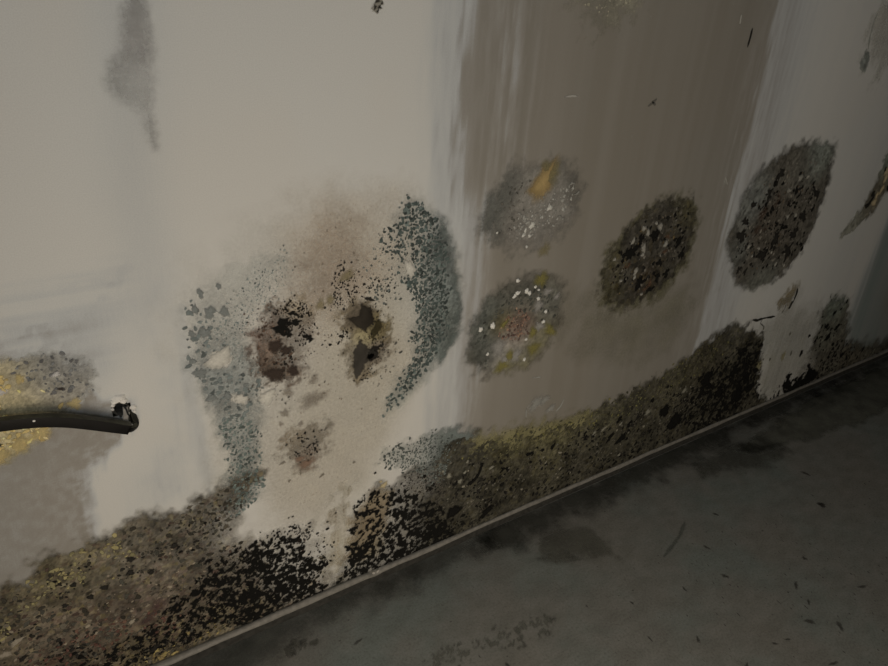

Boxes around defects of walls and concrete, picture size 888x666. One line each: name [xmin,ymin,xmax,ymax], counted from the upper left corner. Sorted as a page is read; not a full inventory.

leakage [482,162,580,255]
leakage [726,140,835,290]
leakage [0,194,888,666]